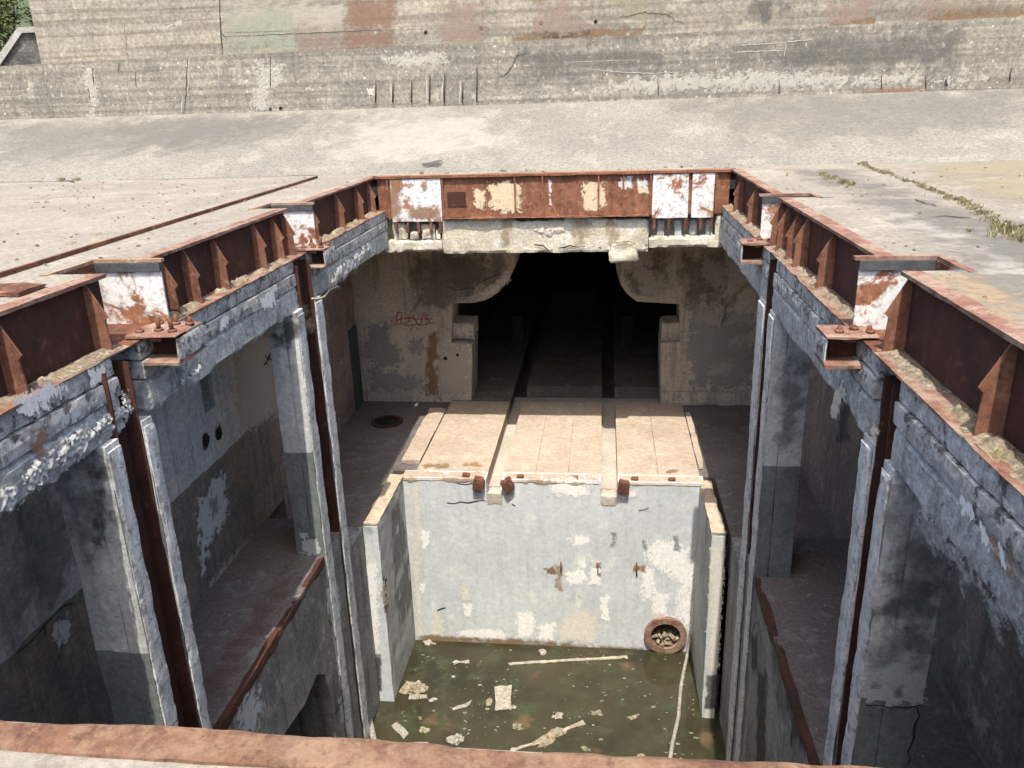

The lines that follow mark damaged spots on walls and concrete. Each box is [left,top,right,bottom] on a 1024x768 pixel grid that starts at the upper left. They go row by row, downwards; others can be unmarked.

rust [389,179,440,220]
rust [938,274,1024,325]
spalling [0,179,1024,768]
rust [545,562,563,591]
crack [865,705,929,765]